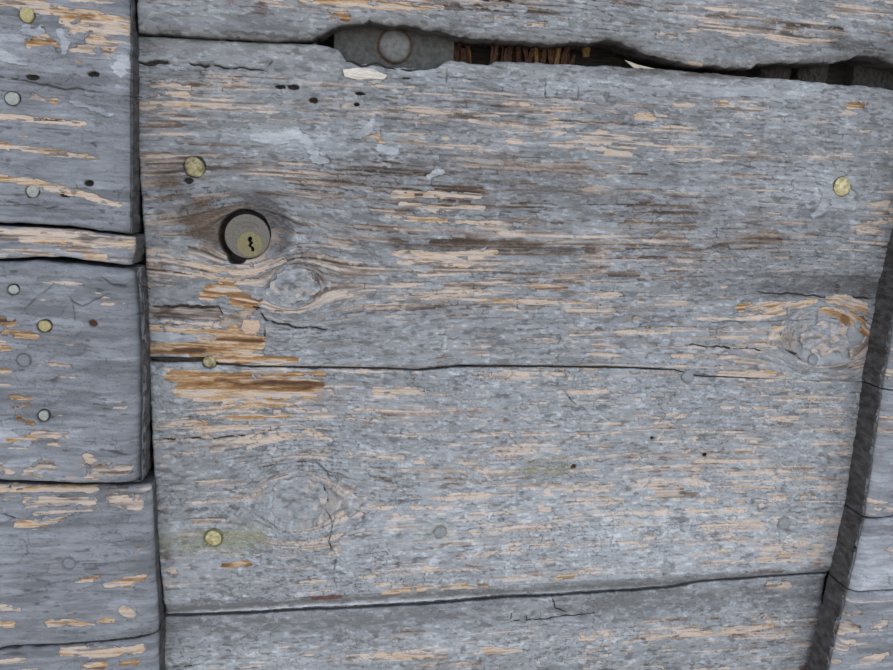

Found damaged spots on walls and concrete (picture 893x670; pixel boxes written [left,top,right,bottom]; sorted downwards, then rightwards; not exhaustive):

peeling [0,0,131,78]
peeling [0,114,87,128]
peeling [0,174,122,208]
crack [253,306,326,339]
crack [689,343,762,351]
peeling [735,294,869,370]
peeling [149,324,326,427]
crack [150,357,759,380]
peeling [0,395,69,447]
peeling [0,453,146,528]
peeling [75,569,178,588]
crack [508,599,595,623]